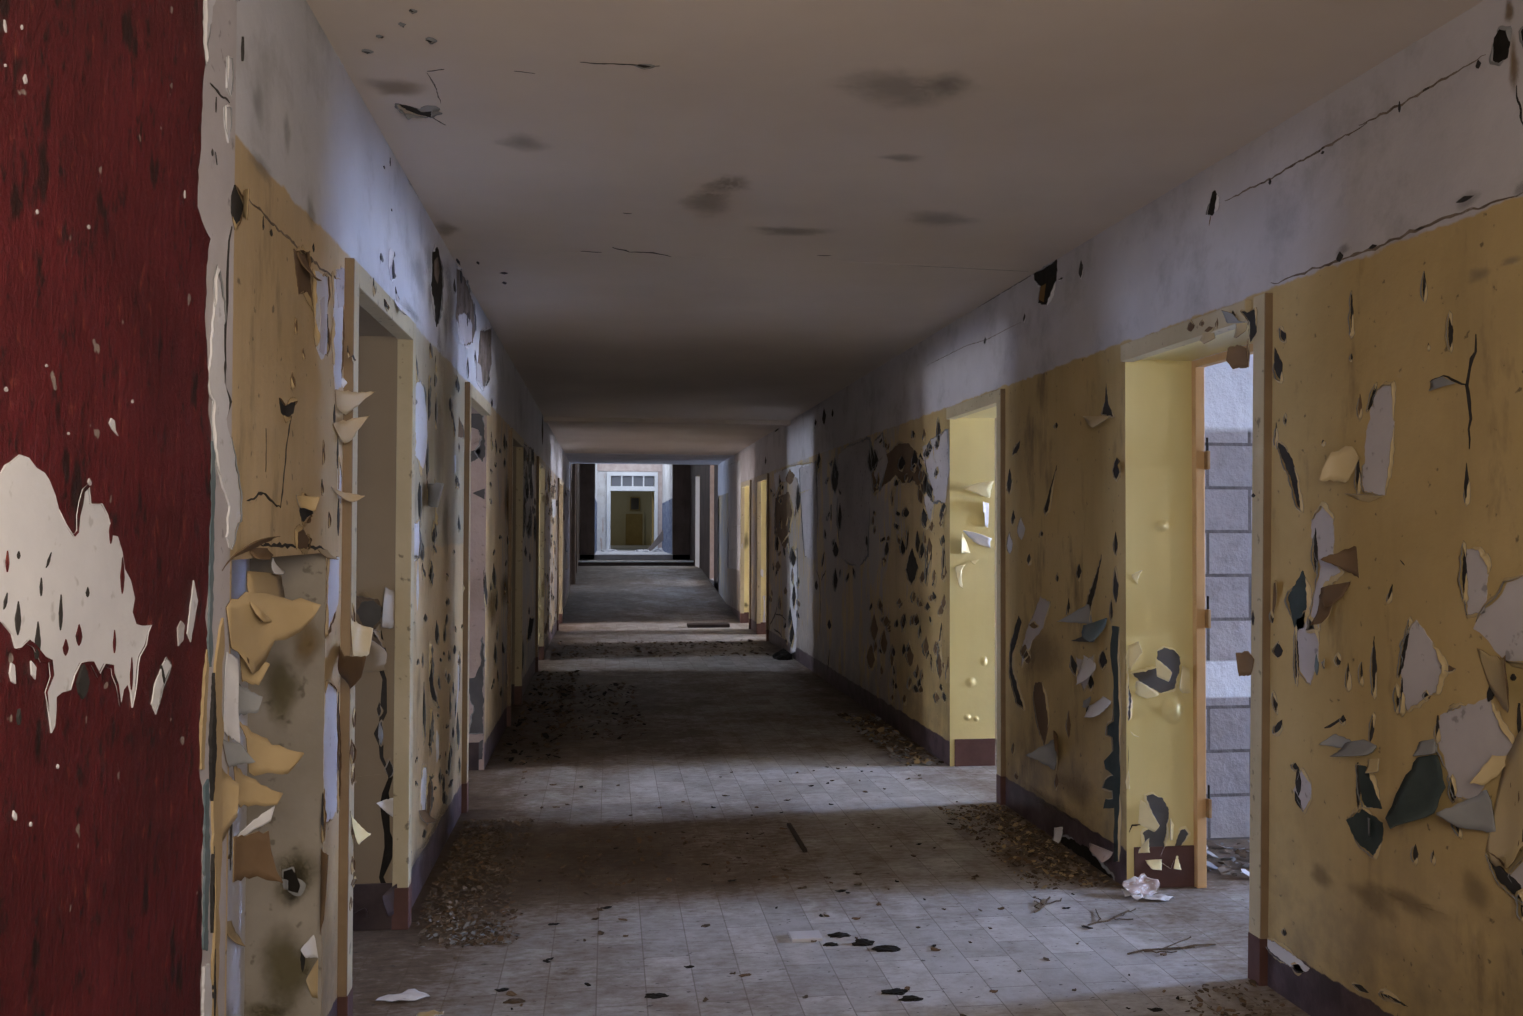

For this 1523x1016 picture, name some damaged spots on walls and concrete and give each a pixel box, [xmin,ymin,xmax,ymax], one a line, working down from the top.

spalling [1489,3,1523,82]
crack [1225,54,1486,201]
crack [1515,85,1523,125]
crack [249,199,335,278]
crack [1271,193,1521,284]
peeling [1187,307,1257,369]
crack [247,416,292,508]
peeling [1319,381,1396,502]
peeling [411,244,573,854]
peeling [760,416,1057,706]
flaking render [1009,532,1191,881]
peeling [1236,651,1254,676]